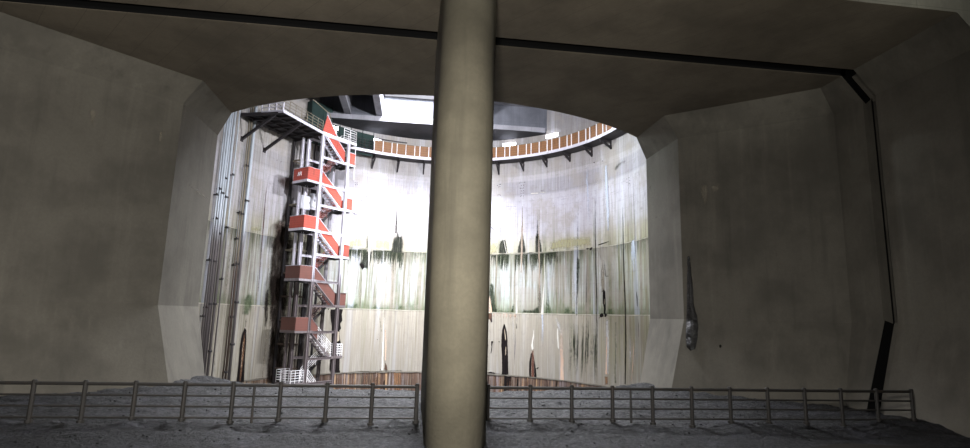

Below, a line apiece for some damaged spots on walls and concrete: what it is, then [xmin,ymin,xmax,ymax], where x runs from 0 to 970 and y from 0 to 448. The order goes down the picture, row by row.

water stain [262,201,293,382]
water stain [349,212,404,271]
water stain [491,207,558,329]